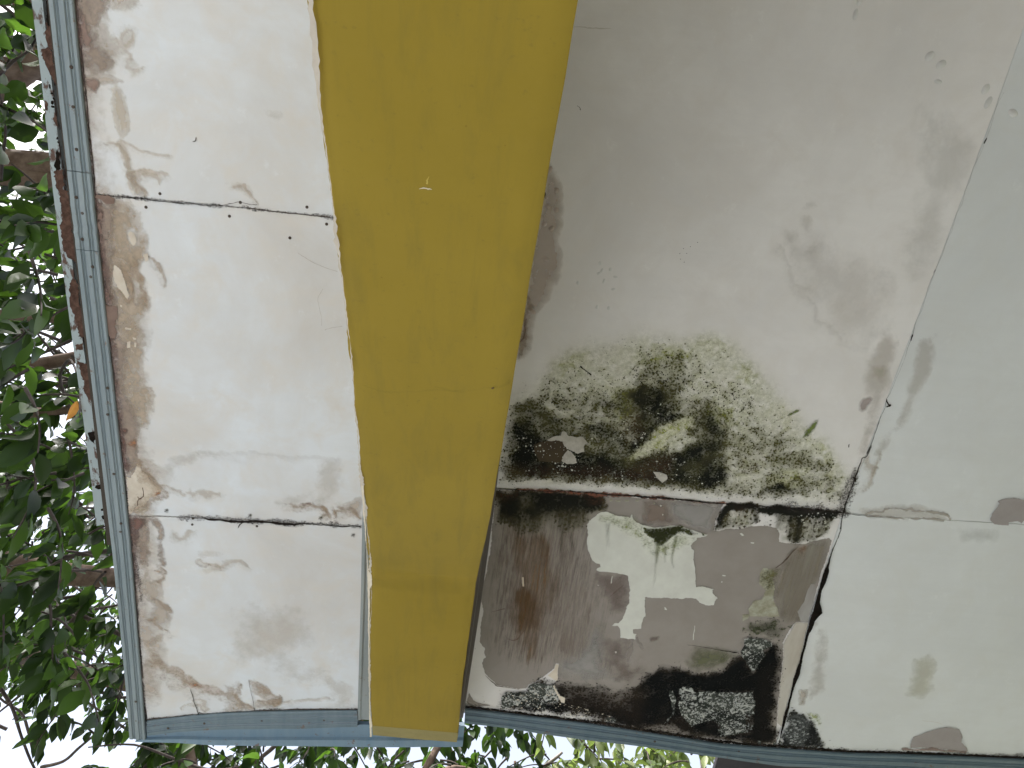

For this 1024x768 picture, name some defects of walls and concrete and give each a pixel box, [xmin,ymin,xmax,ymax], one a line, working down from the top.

damp [75,0,85,82]
corrosion [79,0,113,92]
corrosion [41,0,76,263]
corrosion [69,277,91,400]
damp [94,176,333,479]
crack [778,96,1002,746]
damp [128,505,361,648]
peeling [480,490,832,744]
damp [494,339,848,750]
peeling [865,507,951,521]
peeling [990,498,1024,525]
peeling [902,721,968,753]